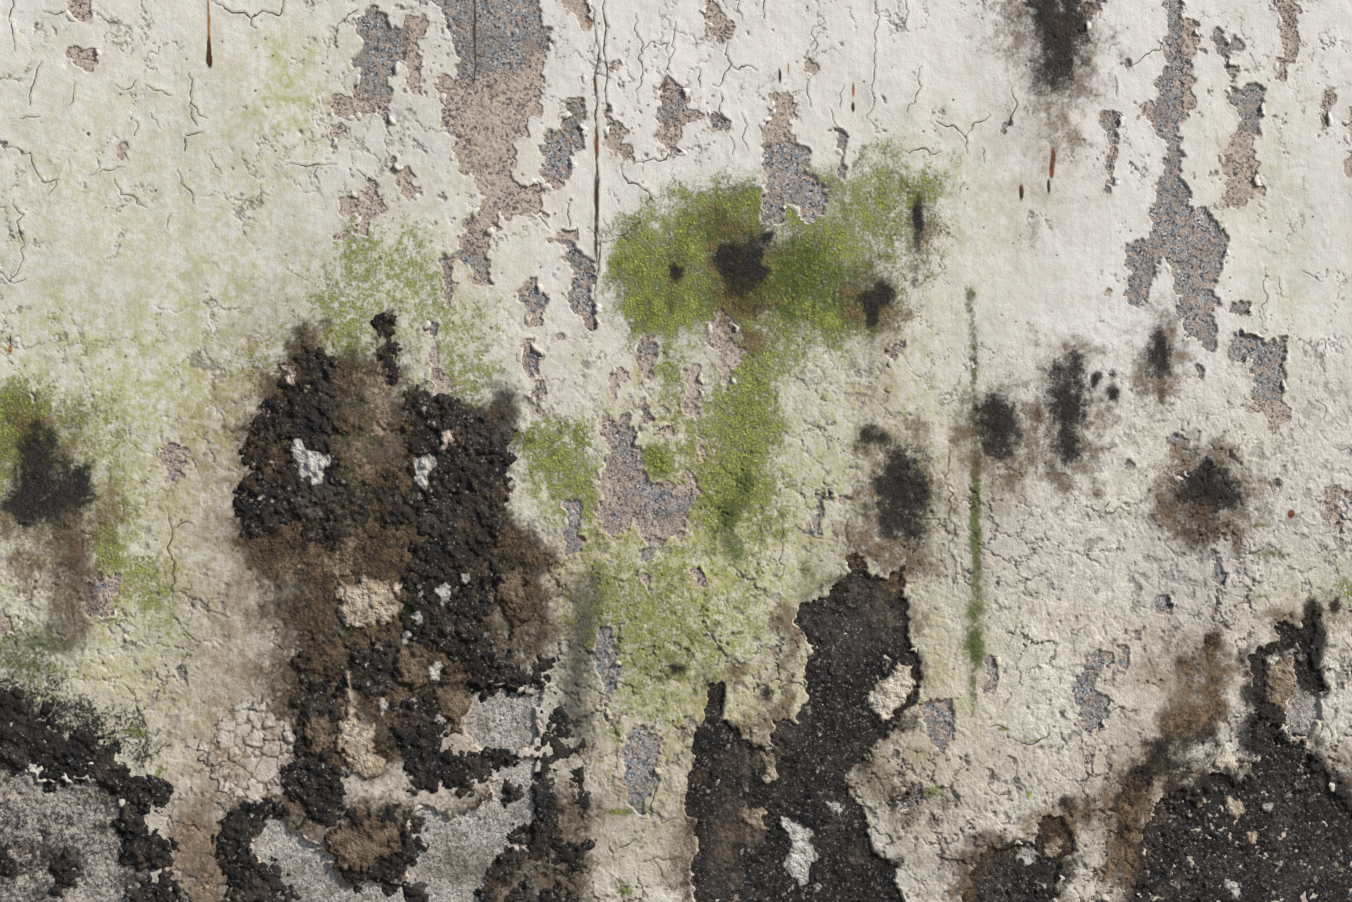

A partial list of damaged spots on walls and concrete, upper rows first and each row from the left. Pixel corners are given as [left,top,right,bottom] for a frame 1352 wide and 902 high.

leakage [0,309,601,902]
peeling [422,321,453,395]
peeling [327,0,634,307]
peeling [516,226,603,420]
crack [537,0,765,301]
peeling [758,92,847,224]
leakage [662,416,956,902]
leakage [996,0,1098,148]
leakage [950,312,1190,510]
leakage [943,597,1352,902]
peeling [1098,0,1291,435]
leakage [1152,435,1266,554]